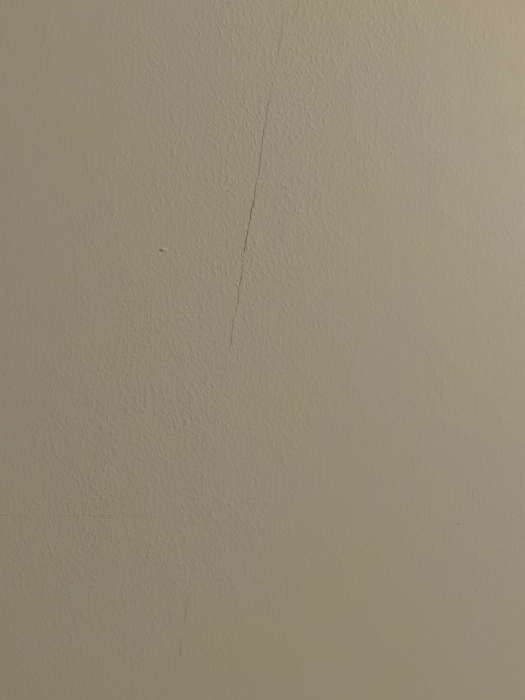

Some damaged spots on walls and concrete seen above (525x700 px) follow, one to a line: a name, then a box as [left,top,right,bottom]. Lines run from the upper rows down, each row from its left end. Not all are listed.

crack [226,2,299,347]